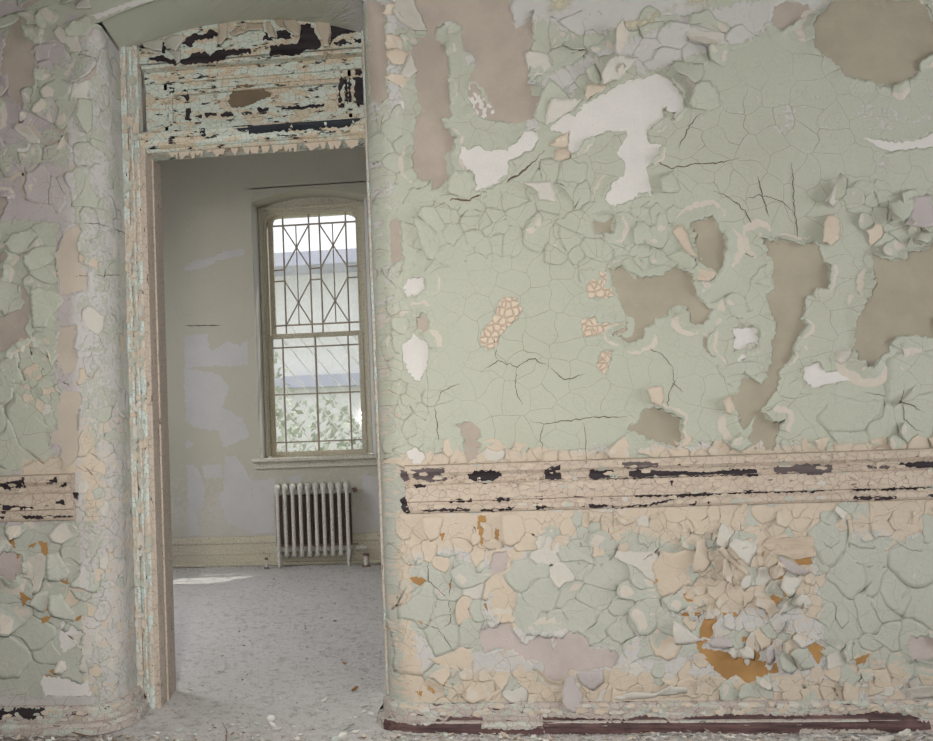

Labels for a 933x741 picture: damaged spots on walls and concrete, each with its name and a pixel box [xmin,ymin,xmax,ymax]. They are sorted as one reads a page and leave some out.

peeling [142,29,251,66]
peeling [169,83,271,137]
peeling [169,140,359,159]
peeling [183,332,250,447]
crack [484,340,611,459]
flaking render [229,0,933,741]
crack [650,349,682,406]